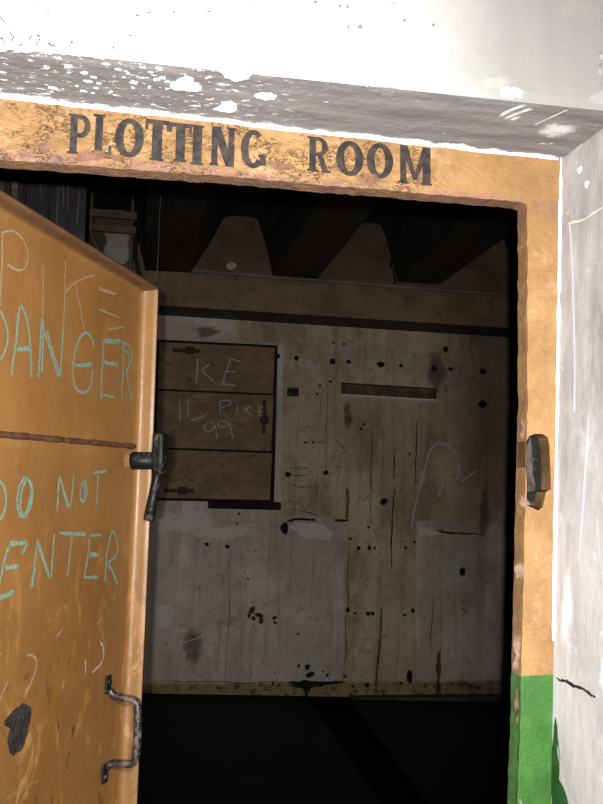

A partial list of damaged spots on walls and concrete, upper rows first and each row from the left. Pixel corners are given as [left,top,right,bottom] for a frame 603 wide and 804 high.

peeling [0,29,101,94]
peeling [93,55,138,89]
peeling [112,44,208,92]
peeling [218,64,256,82]
peeling [213,101,237,113]
peeling [254,92,277,100]
crack [557,678,595,698]
peeling [551,717,568,804]